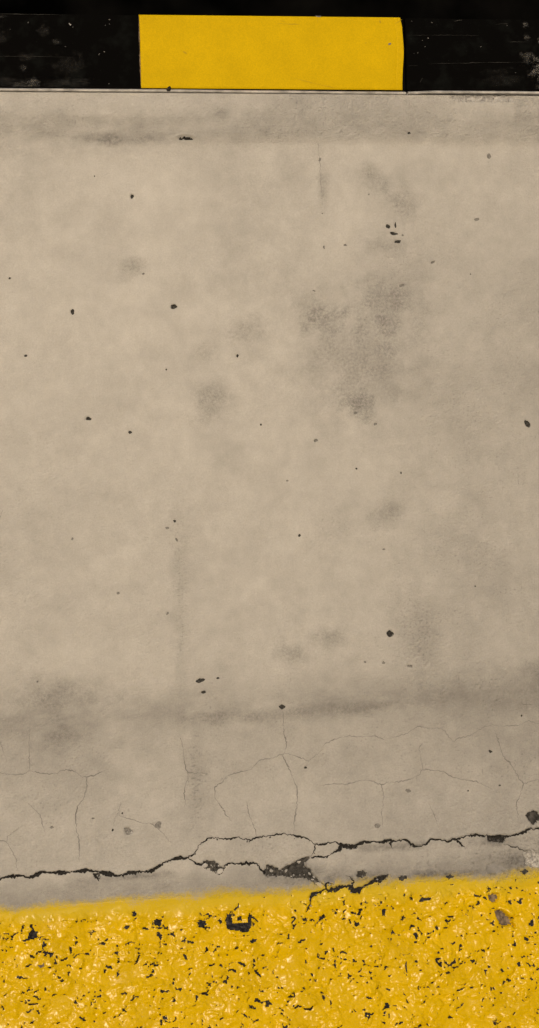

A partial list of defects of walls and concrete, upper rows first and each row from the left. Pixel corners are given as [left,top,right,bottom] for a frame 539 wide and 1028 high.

crack [0,703,539,912]